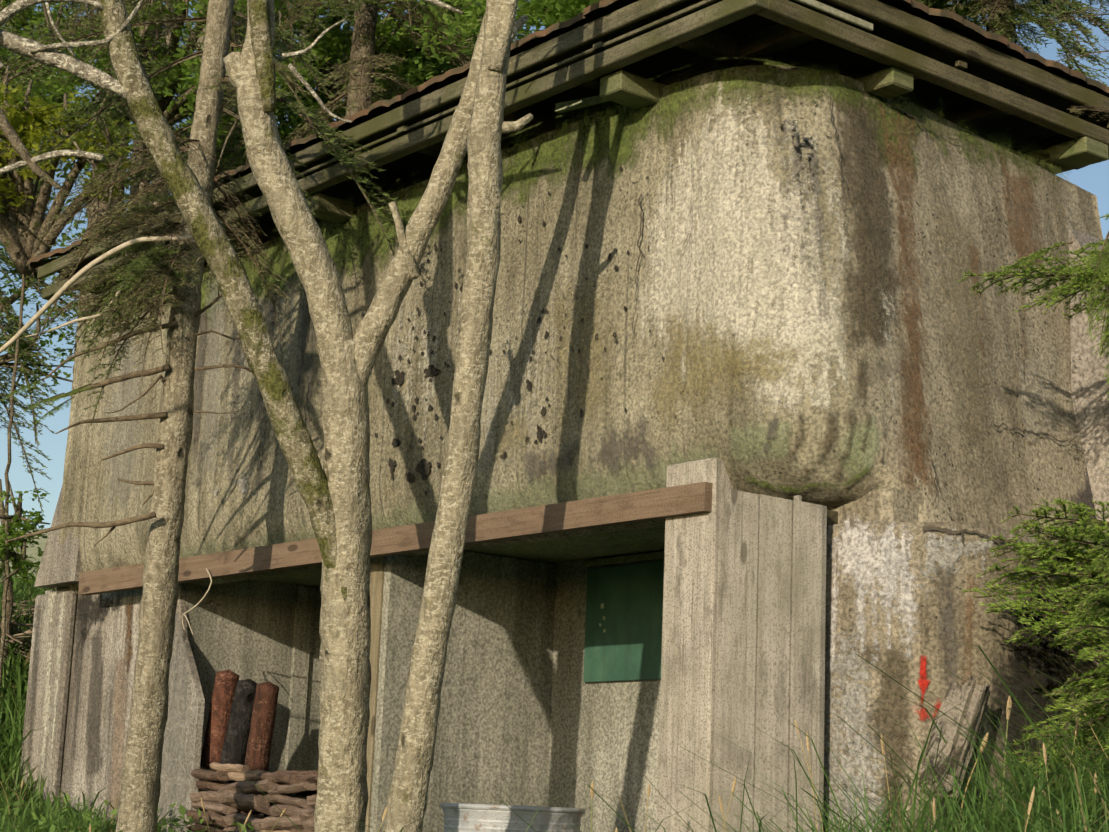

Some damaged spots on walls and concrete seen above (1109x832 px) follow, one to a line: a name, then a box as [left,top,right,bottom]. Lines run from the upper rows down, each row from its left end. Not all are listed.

leakage [386,306,458,431]
leakage [482,287,592,481]
leakage [591,419,655,473]
leakage [638,85,898,493]
rust [882,108,933,490]
crack [993,423,1086,451]
leakage [27,587,120,787]
leakage [823,518,993,832]